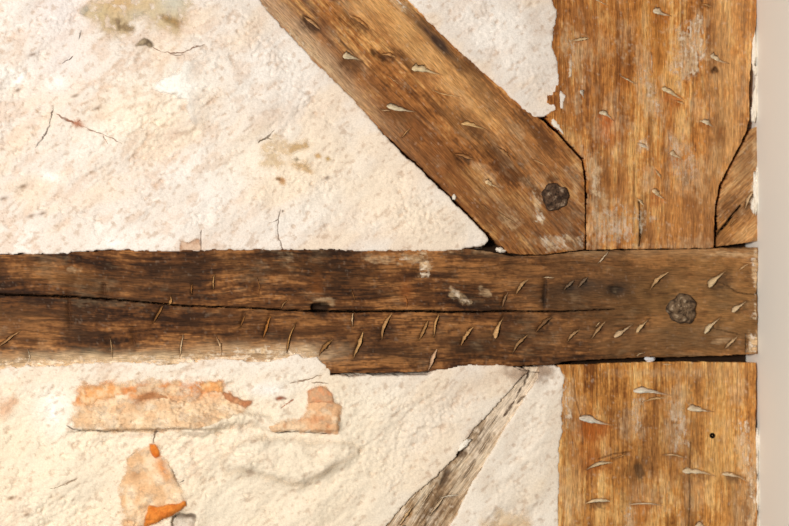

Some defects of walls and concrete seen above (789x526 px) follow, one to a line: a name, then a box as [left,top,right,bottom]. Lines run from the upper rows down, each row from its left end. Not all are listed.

water stain [81,0,190,33]
crack [42,110,122,144]
crack [0,285,609,318]
spalling [73,378,252,433]
spalling [269,386,342,434]
spalling [120,444,196,526]